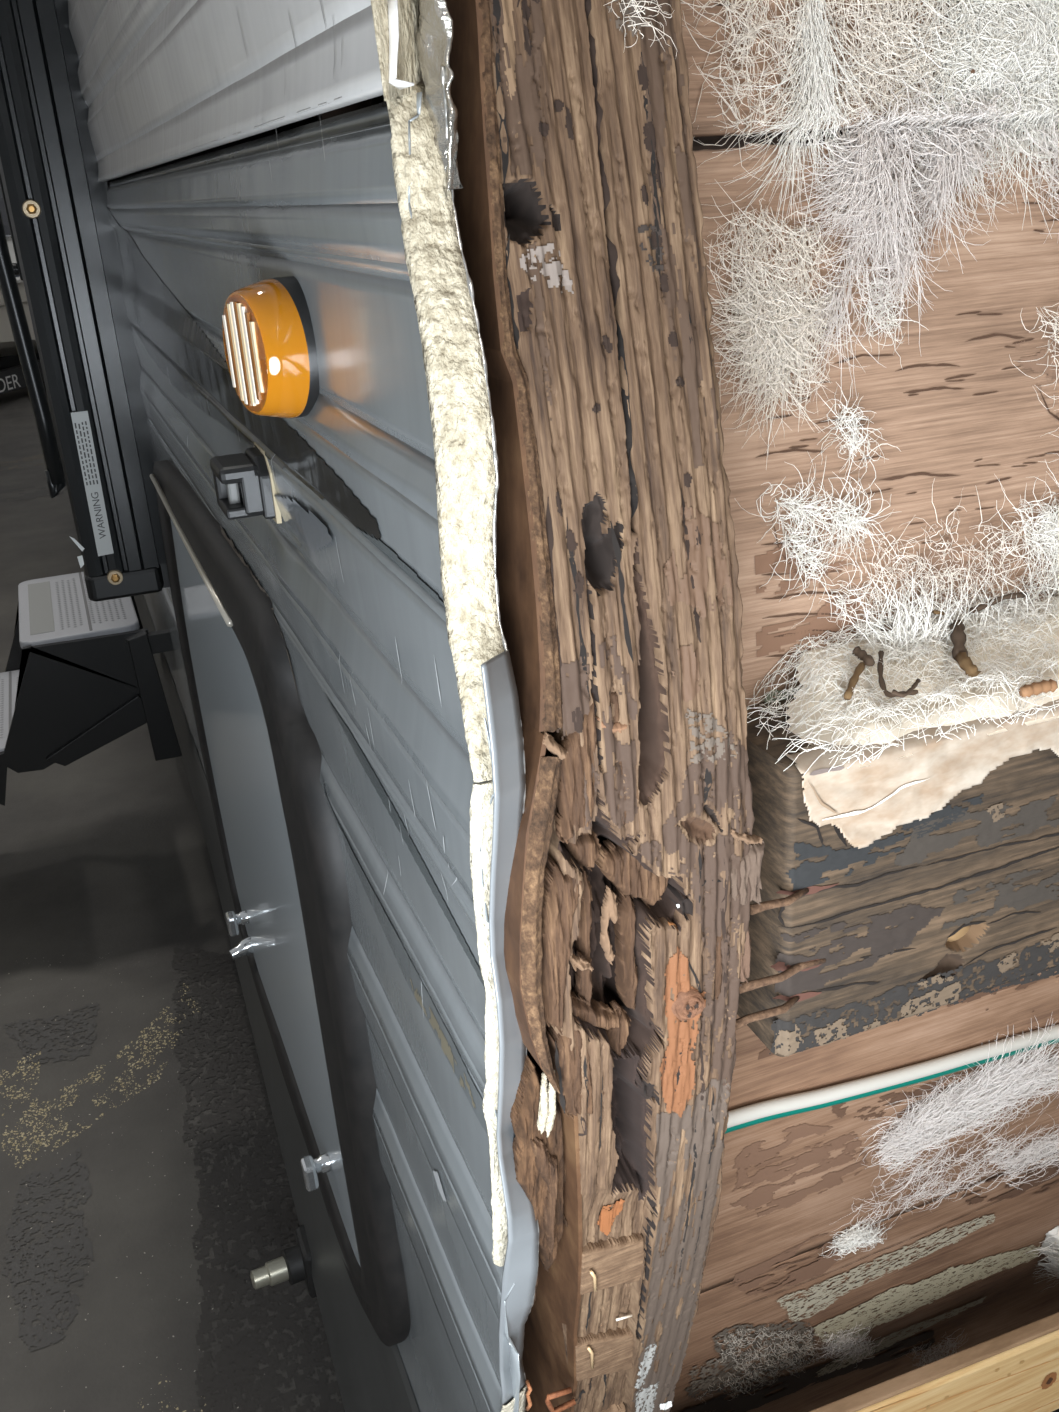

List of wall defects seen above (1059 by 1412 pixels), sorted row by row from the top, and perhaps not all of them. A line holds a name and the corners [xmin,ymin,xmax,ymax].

hole [502,178,561,247]
hole [680,805,723,844]
leakage [786,794,1059,891]
spalling [556,491,693,1412]
corrosion [659,947,706,1118]
leakage [556,635,983,1412]
peeling [774,1017,881,1057]
leakage [758,940,1059,1060]
leakage [774,869,1059,997]
peeling [901,953,965,1018]
peeling [997,951,1019,973]
leakage [960,1158,1059,1205]